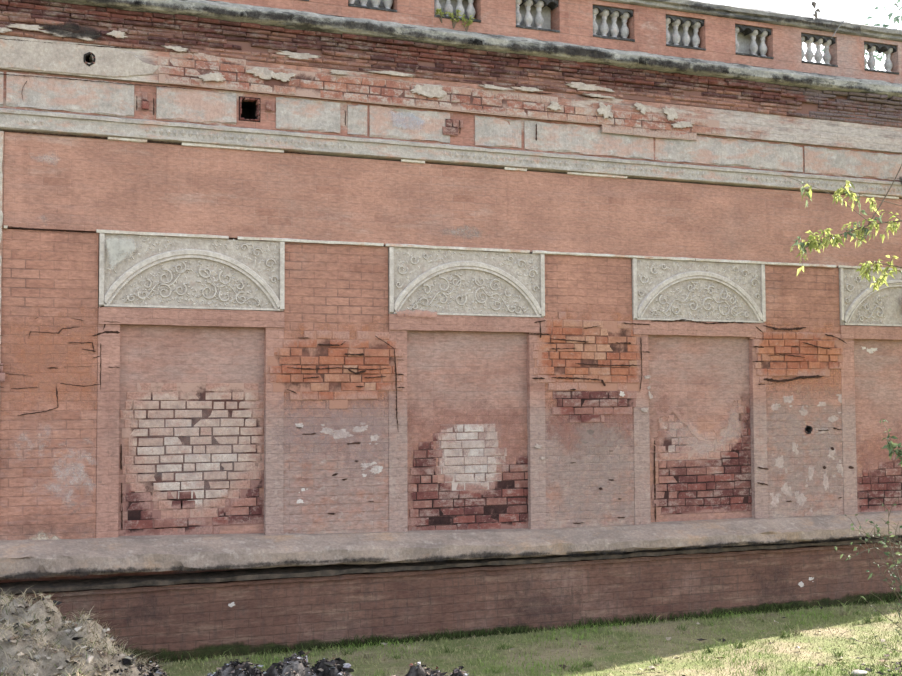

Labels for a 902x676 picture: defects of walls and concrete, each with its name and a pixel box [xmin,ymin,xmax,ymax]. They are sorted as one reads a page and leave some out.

spalling [0,23,726,141]
crack [0,306,120,416]
flaking render [118,382,264,536]
spalling [265,325,404,409]
peeling [295,422,379,445]
crack [287,336,405,432]
peeling [355,460,383,477]
spalling [407,424,528,531]
spalling [532,311,752,515]
spalling [750,323,902,512]